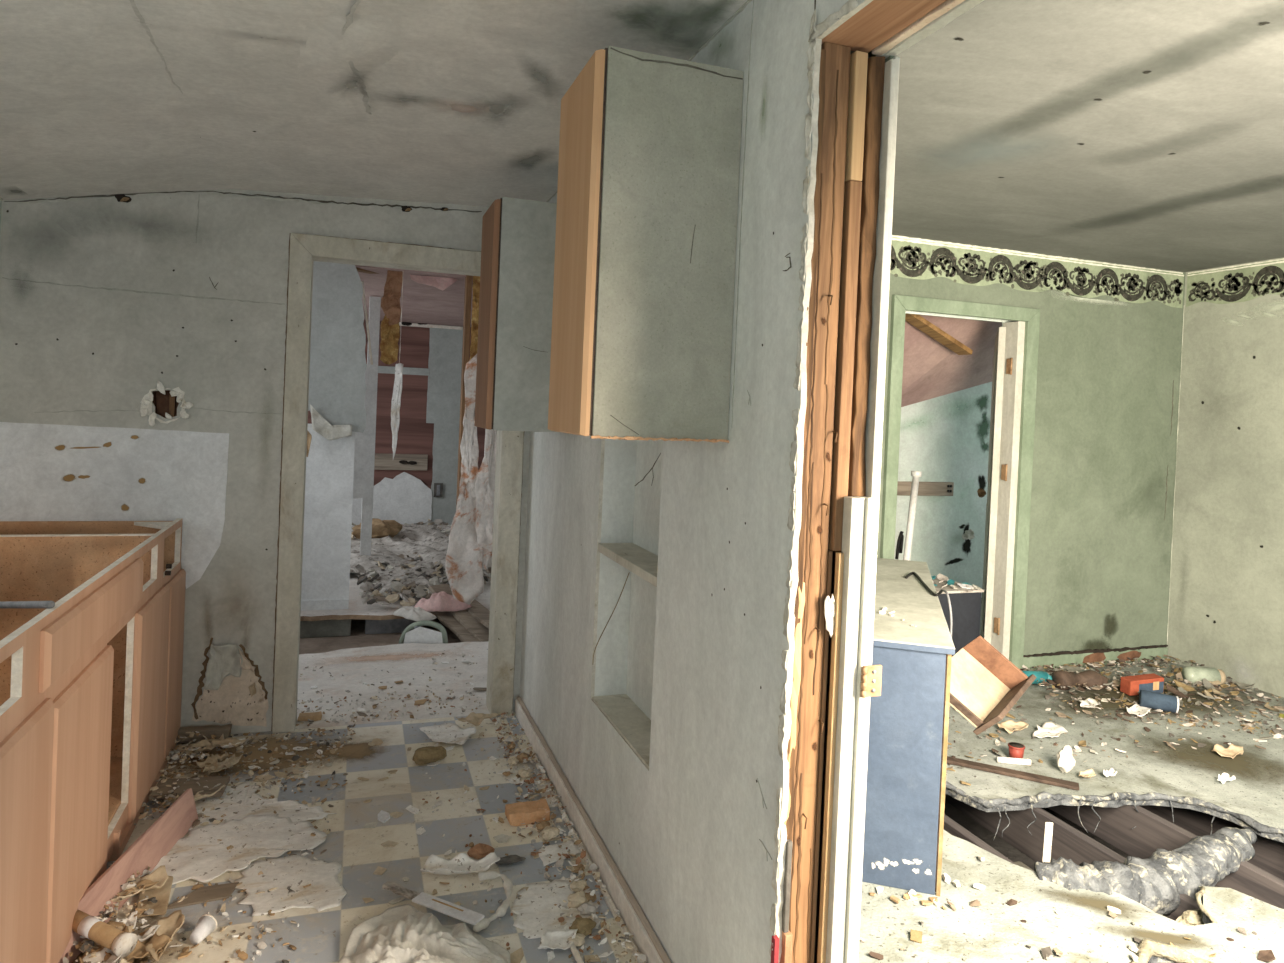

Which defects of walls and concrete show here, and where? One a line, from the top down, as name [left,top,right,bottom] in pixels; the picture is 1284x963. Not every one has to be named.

crack [129,0,183,94]
spalling [140,381,193,427]
water stain [1084,615,1116,650]
peeling [191,637,269,727]